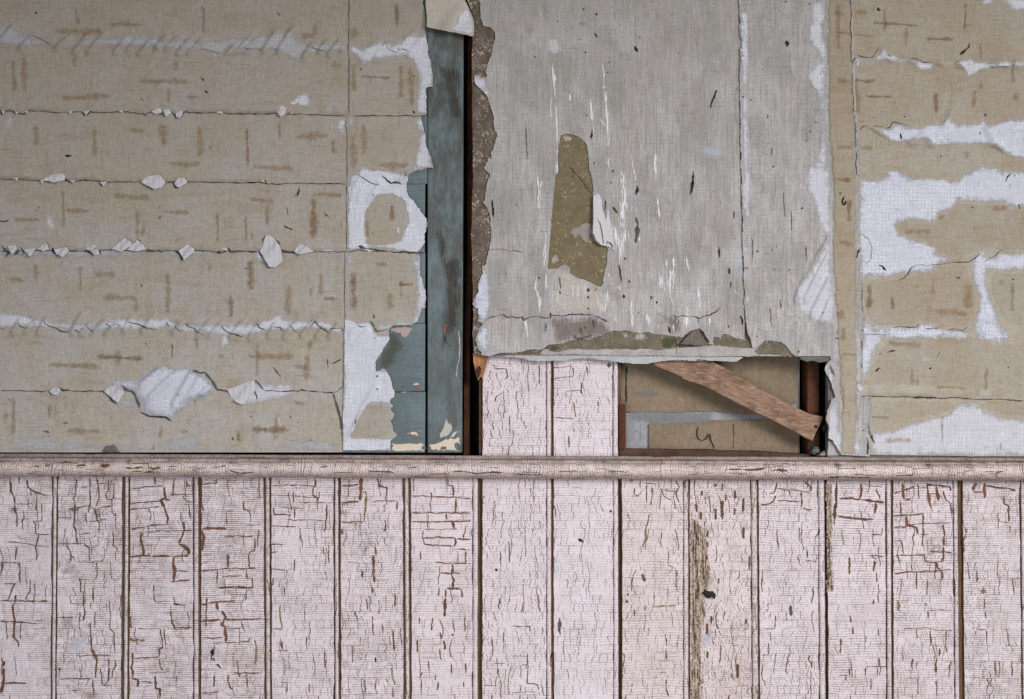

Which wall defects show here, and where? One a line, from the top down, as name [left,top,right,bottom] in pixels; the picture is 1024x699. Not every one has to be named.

spalling [467,0,831,364]
peeling [390,327,412,337]
crack [0,465,542,698]
crack [609,471,680,568]
crack [761,470,1016,692]